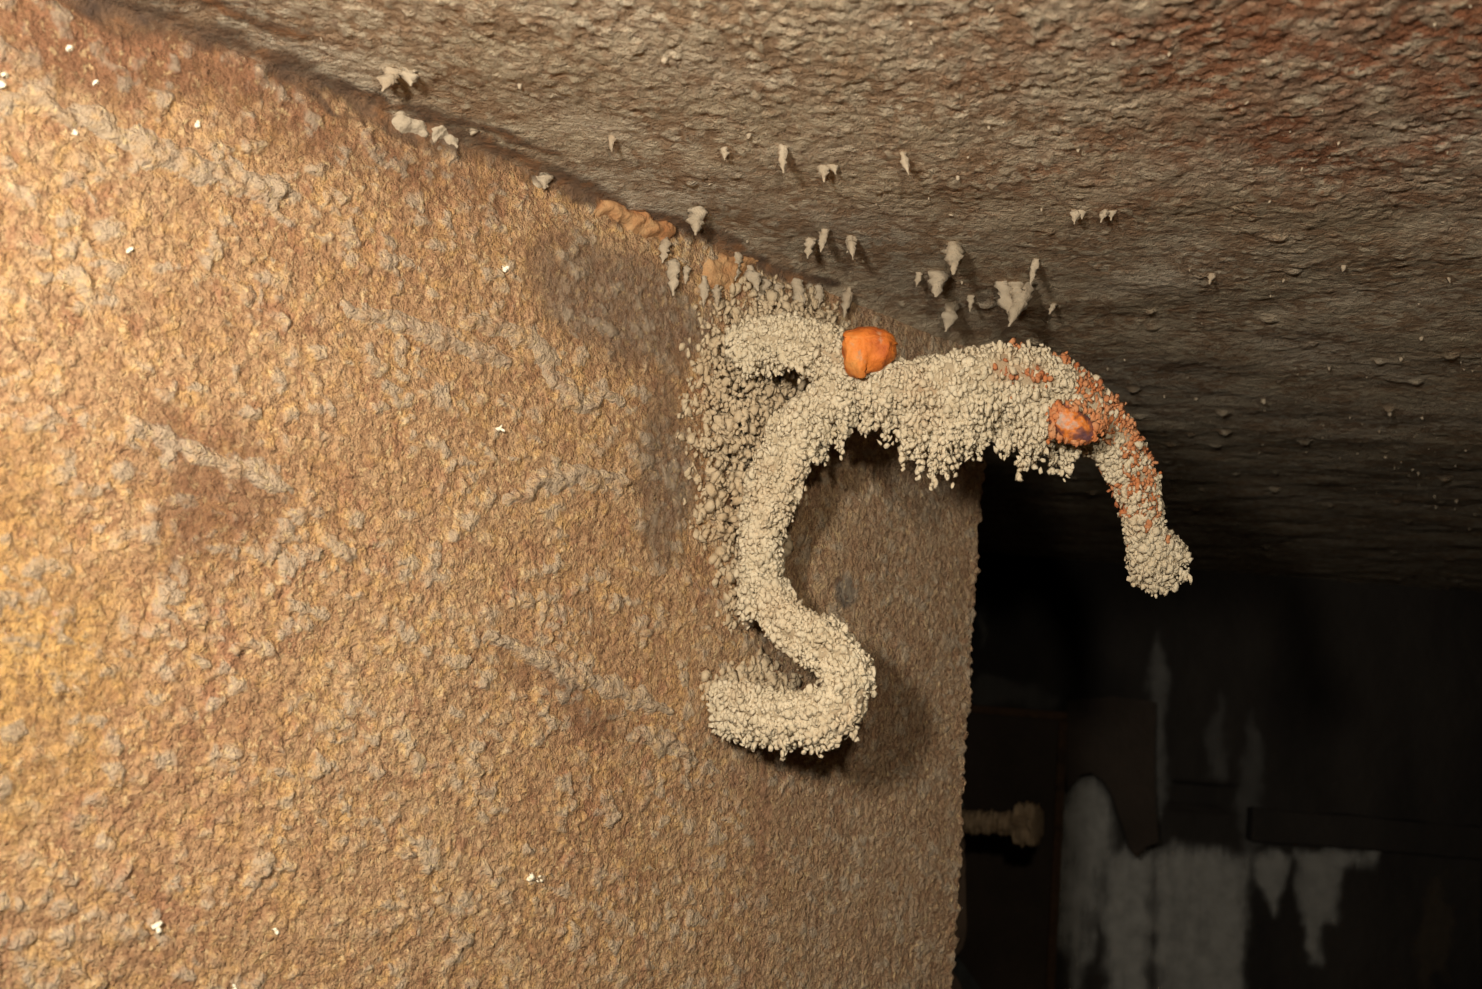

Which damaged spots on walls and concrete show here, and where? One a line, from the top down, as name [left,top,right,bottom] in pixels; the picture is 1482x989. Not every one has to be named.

water stain [544,241,1194,761]
corrosion [992,338,1171,547]
efflorescence [1059,780,1378,989]